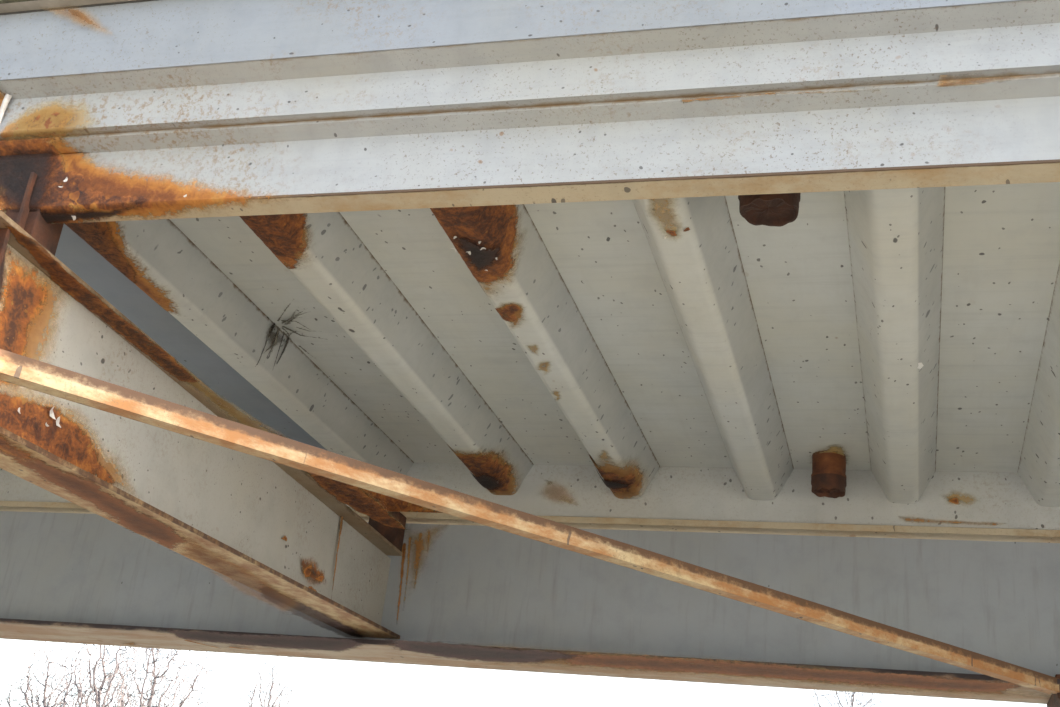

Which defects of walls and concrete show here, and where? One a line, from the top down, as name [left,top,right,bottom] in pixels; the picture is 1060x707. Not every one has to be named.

rust [0,103,308,313]
rust [430,205,518,292]
rust [0,226,281,436]
rust [496,303,522,327]
rust [528,346,549,371]
rust [0,380,187,550]
rust [448,445,517,495]
rust [589,451,643,499]
rust [302,472,442,620]
rust [260,584,367,639]